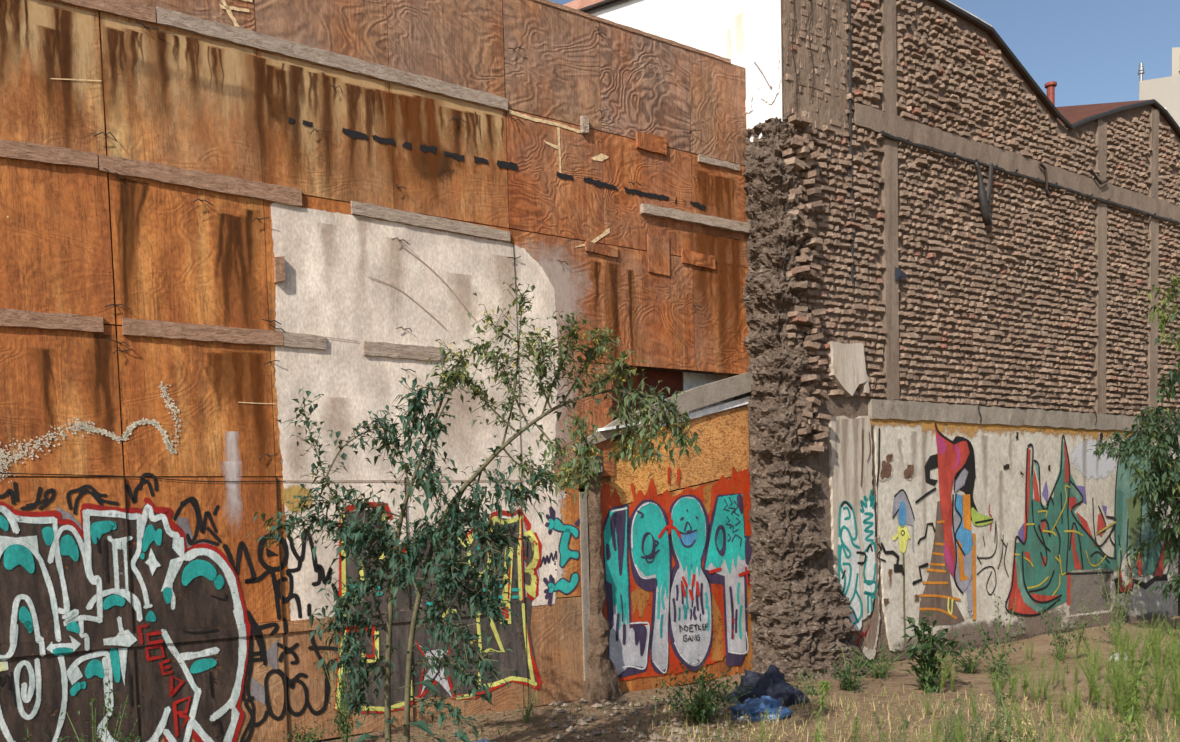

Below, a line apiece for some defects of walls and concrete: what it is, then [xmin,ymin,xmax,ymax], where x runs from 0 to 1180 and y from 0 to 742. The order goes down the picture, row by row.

damp [0,0,27,54]
damp [42,7,71,111]
damp [107,27,224,85]
damp [247,54,503,167]
damp [118,177,147,287]
damp [217,209,256,299]
damp [594,261,633,362]
damp [695,232,740,321]
peeling [825,341,870,397]